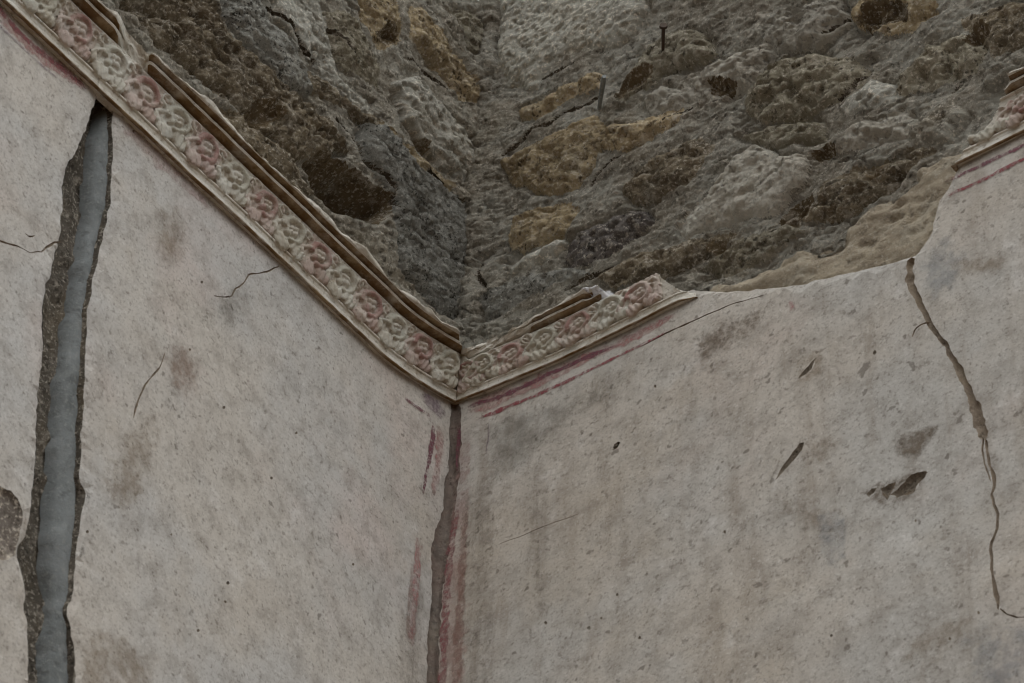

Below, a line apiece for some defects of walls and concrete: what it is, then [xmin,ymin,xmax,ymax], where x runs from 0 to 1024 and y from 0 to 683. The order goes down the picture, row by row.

flaking render [99,0,1024,349]
crack [0,233,61,253]
crack [214,266,279,298]
flaking render [0,99,113,683]
crack [133,353,165,418]
flaking render [776,442,804,479]
flaking render [866,471,927,500]
crack [905,257,1024,618]